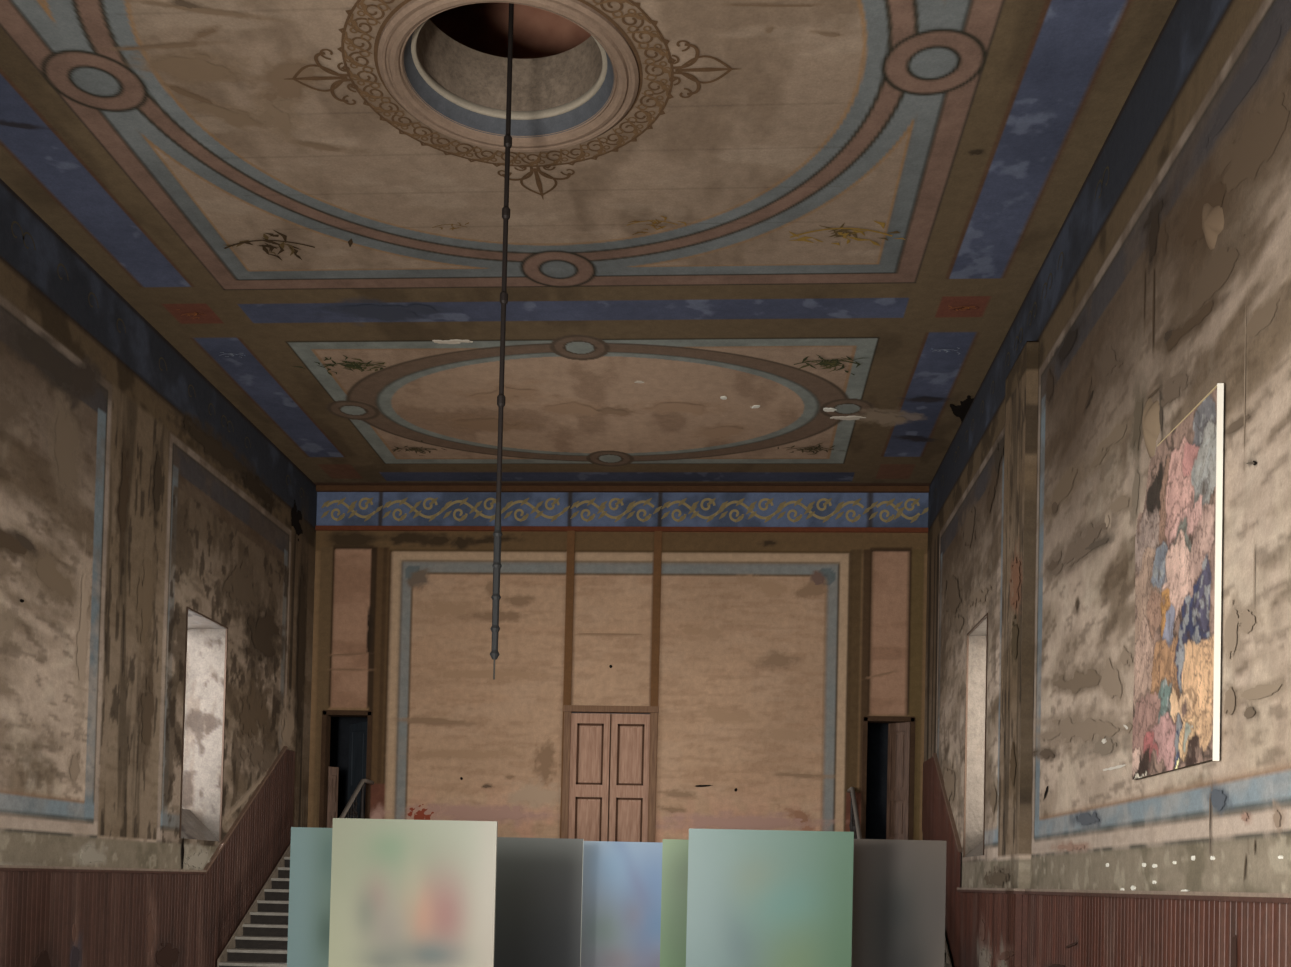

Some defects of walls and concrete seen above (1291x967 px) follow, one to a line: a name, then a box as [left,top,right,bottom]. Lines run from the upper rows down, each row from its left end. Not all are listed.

water stain [118,453,129,532]